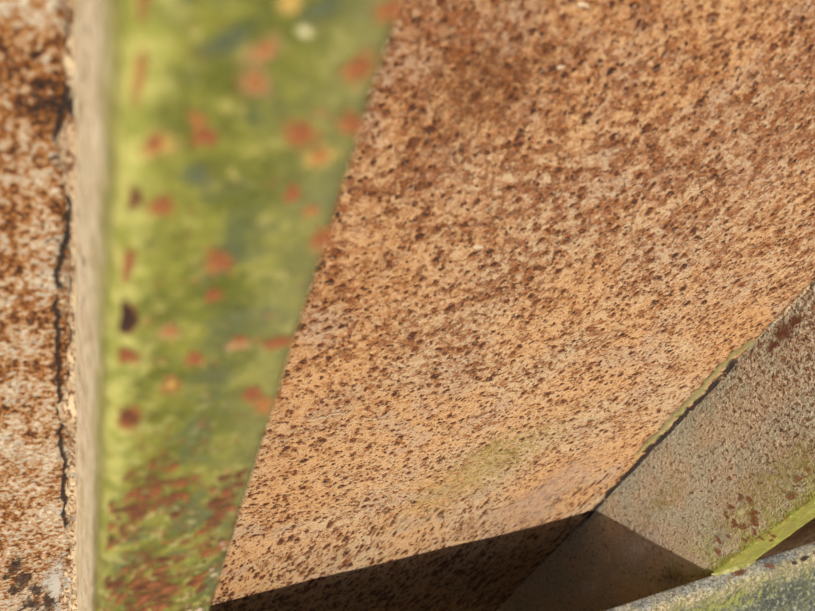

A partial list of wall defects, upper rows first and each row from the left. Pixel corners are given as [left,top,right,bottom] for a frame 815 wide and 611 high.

rust [279,0,300,13]
rust [298,25,311,37]
crack [49,85,74,161]
rust [286,122,344,167]
rust [126,187,172,215]
rust [122,251,135,282]
rust [119,300,139,334]
crack [45,183,72,529]
rust [118,348,139,364]
rust [117,407,141,429]
rust [104,459,248,611]
rust [715,494,777,555]